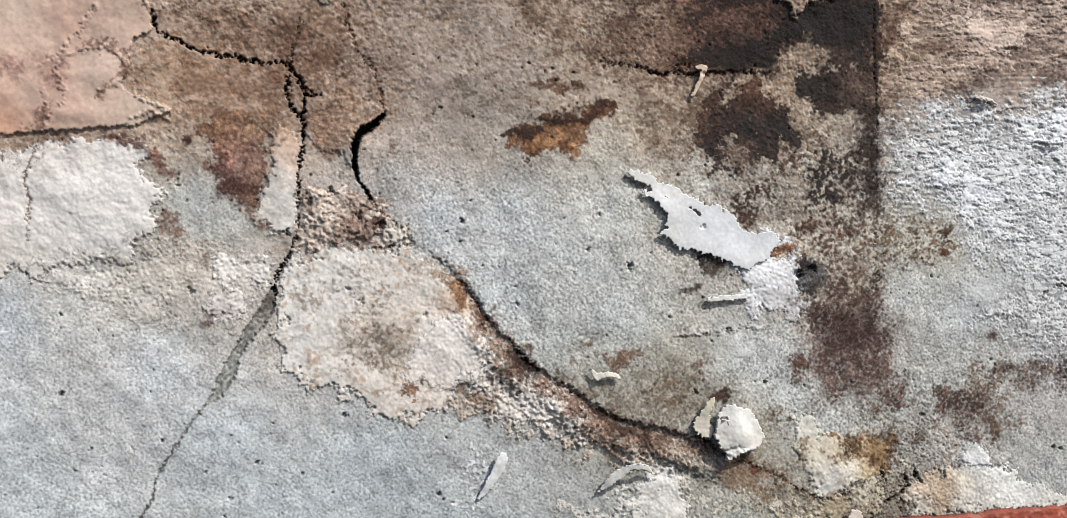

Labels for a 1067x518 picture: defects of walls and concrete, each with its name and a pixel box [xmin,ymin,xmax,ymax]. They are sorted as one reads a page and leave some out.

crack [23,141,38,241]
crack [139,9,321,518]
damp [337,200,386,248]
crack [341,3,413,252]
crack [442,263,542,373]
peeling [0,124,1067,518]
rust [500,76,627,166]
damp [679,251,726,295]
damp [508,0,955,231]
damp [787,253,911,412]
peeling [857,0,1067,380]
crack [683,432,920,502]